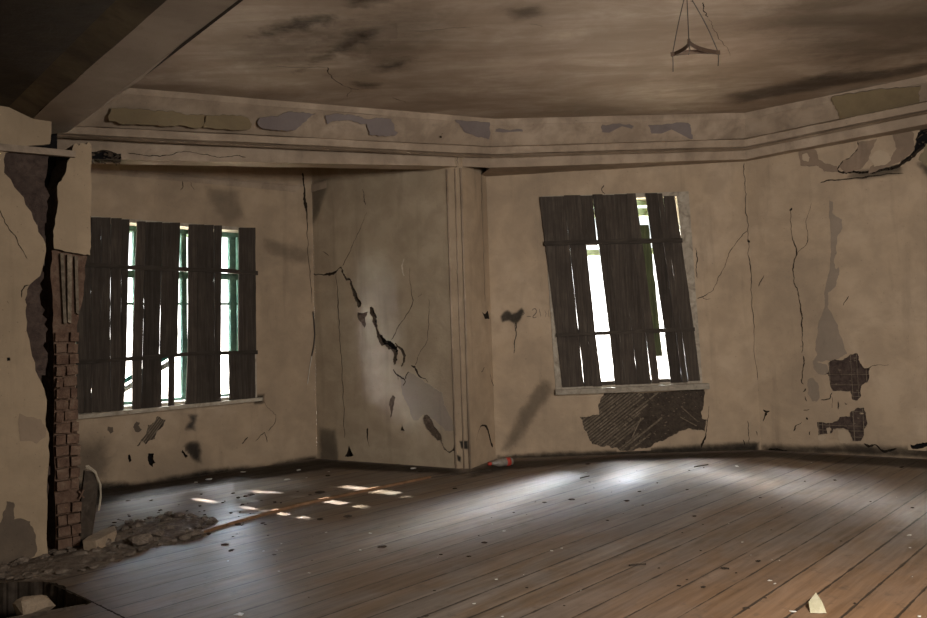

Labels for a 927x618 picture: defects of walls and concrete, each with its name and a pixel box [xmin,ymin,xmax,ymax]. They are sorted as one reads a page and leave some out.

flaking render [798,129,927,174]
crack [817,142,926,183]
crack [0,134,57,381]
crack [302,173,429,386]
crack [790,203,846,435]
flaking render [807,200,870,444]
flaking render [18,414,46,444]
spalling [133,416,165,467]
spalling [580,389,707,451]
flaking render [0,501,37,564]